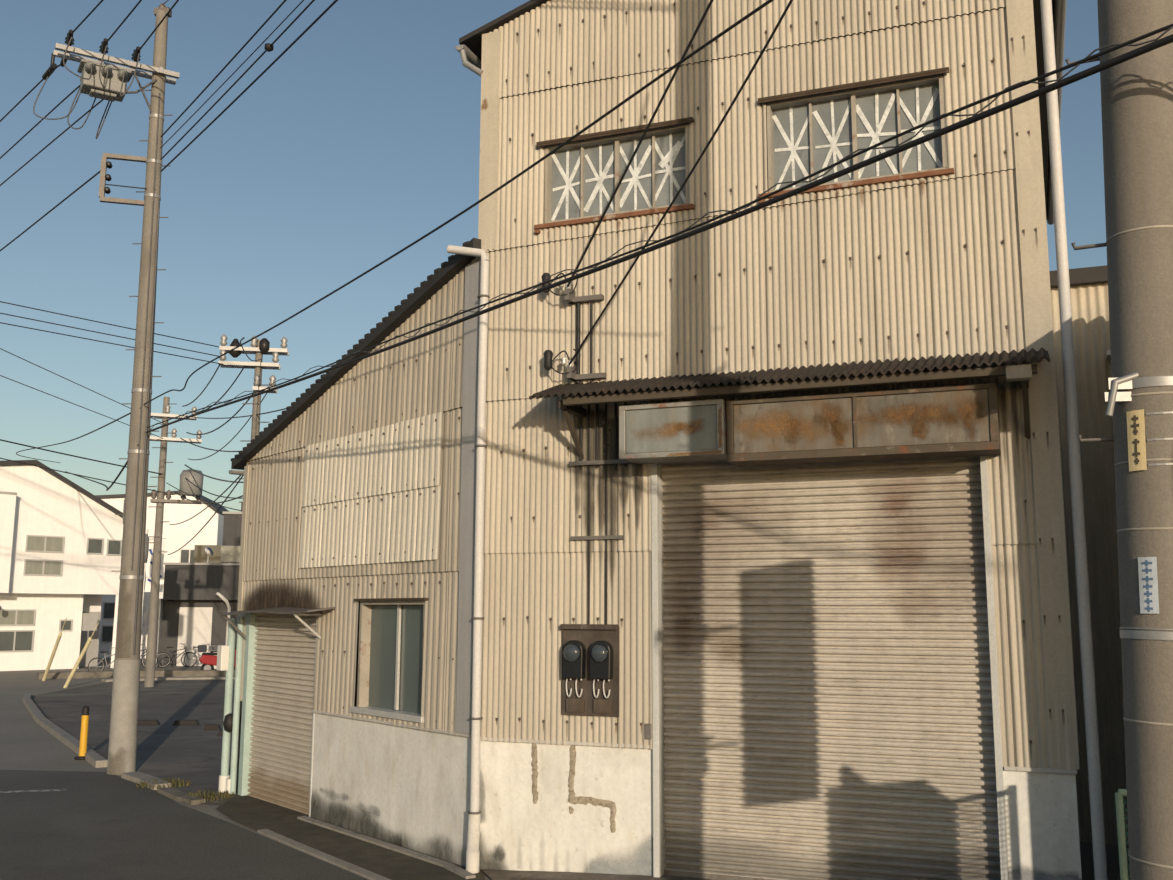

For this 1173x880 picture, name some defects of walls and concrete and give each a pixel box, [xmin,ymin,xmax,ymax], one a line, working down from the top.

corrosion [658,421,701,435]
corrosion [859,401,983,438]
crack [530,743,538,804]
crack [568,745,617,833]
damp [310,794,412,850]
damp [427,842,464,864]